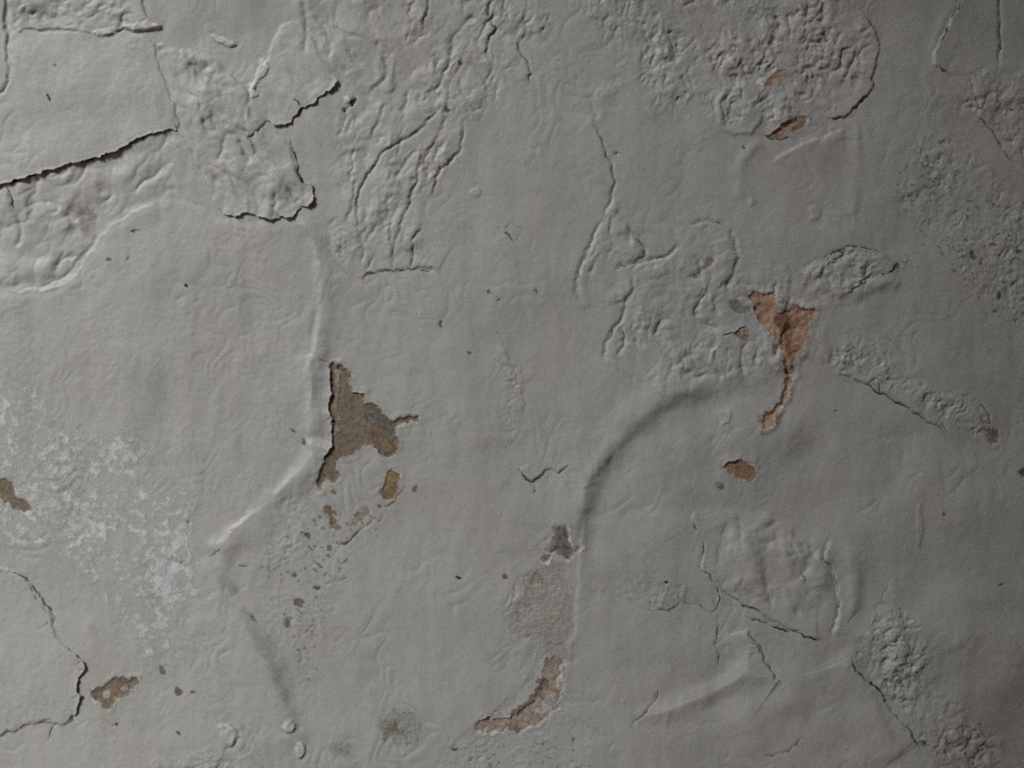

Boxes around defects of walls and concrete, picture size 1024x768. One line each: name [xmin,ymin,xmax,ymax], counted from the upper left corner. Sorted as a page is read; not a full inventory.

peeling [0,0,195,293]
peeling [0,477,35,514]
peeling [314,361,421,530]
crack [518,465,568,494]
spalling [605,220,999,444]
crack [843,370,946,433]
crack [5,571,55,629]
crack [3,712,77,739]
peeling [0,567,142,736]
peeling [473,524,586,737]
crack [648,522,819,681]
crack [852,661,931,748]